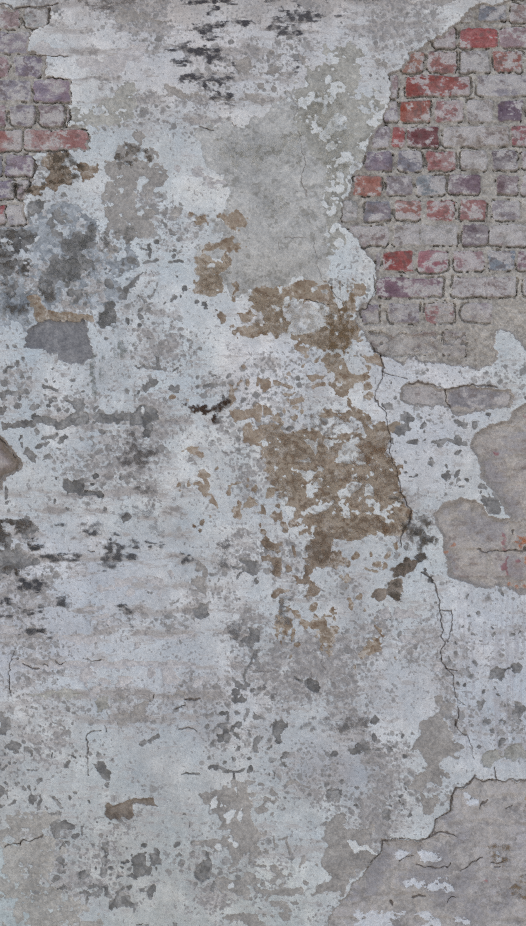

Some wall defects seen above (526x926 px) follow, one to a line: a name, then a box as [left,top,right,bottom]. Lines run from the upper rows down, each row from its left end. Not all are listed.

flaking render [0,0,526,671]
crack [371,343,498,548]
peeling [0,711,163,926]
spalling [182,627,526,926]